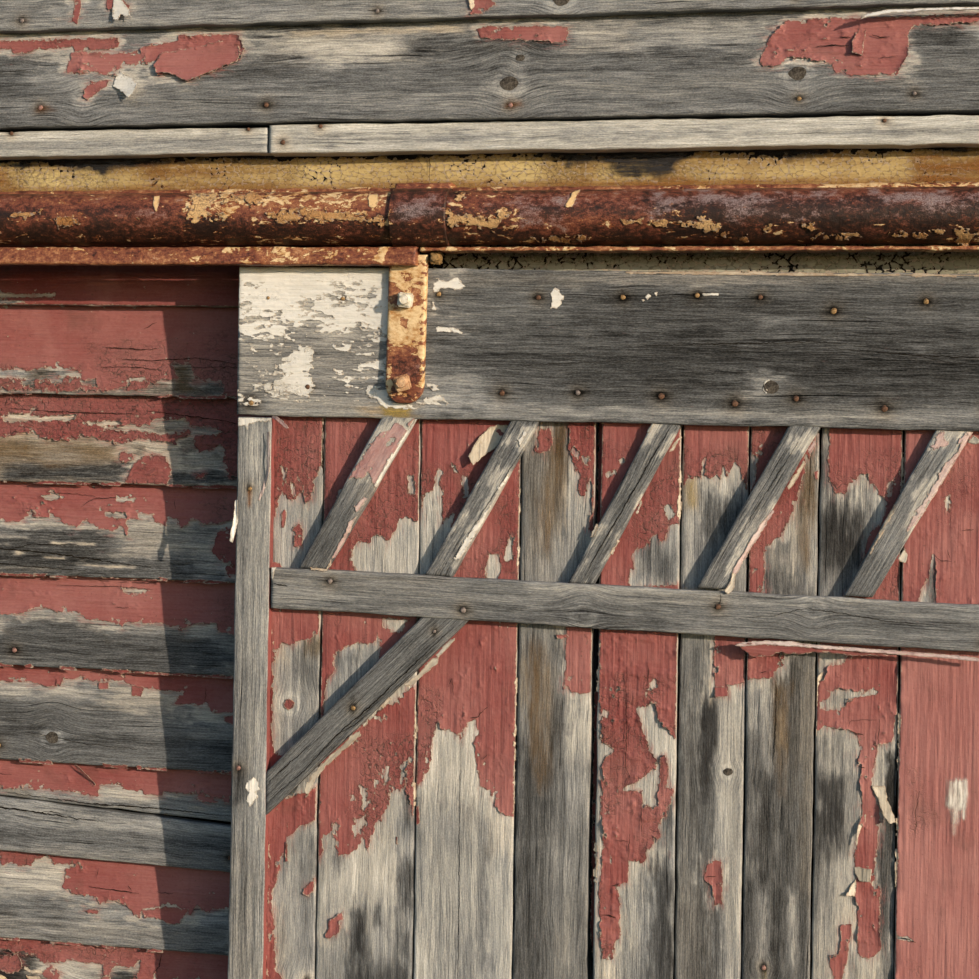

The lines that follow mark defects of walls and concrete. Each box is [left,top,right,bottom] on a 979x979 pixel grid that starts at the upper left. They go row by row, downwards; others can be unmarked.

peeling [0,33,245,101]
peeling [760,7,979,77]
peeling [0,148,979,233]
peeling [431,216,979,310]
peeling [0,265,510,635]
peeling [452,459,522,580]
peeling [0,758,231,803]
peeling [266,608,518,979]
peeling [556,627,677,960]
peeling [713,636,979,979]
peeling [0,850,230,925]
peeling [0,937,228,979]